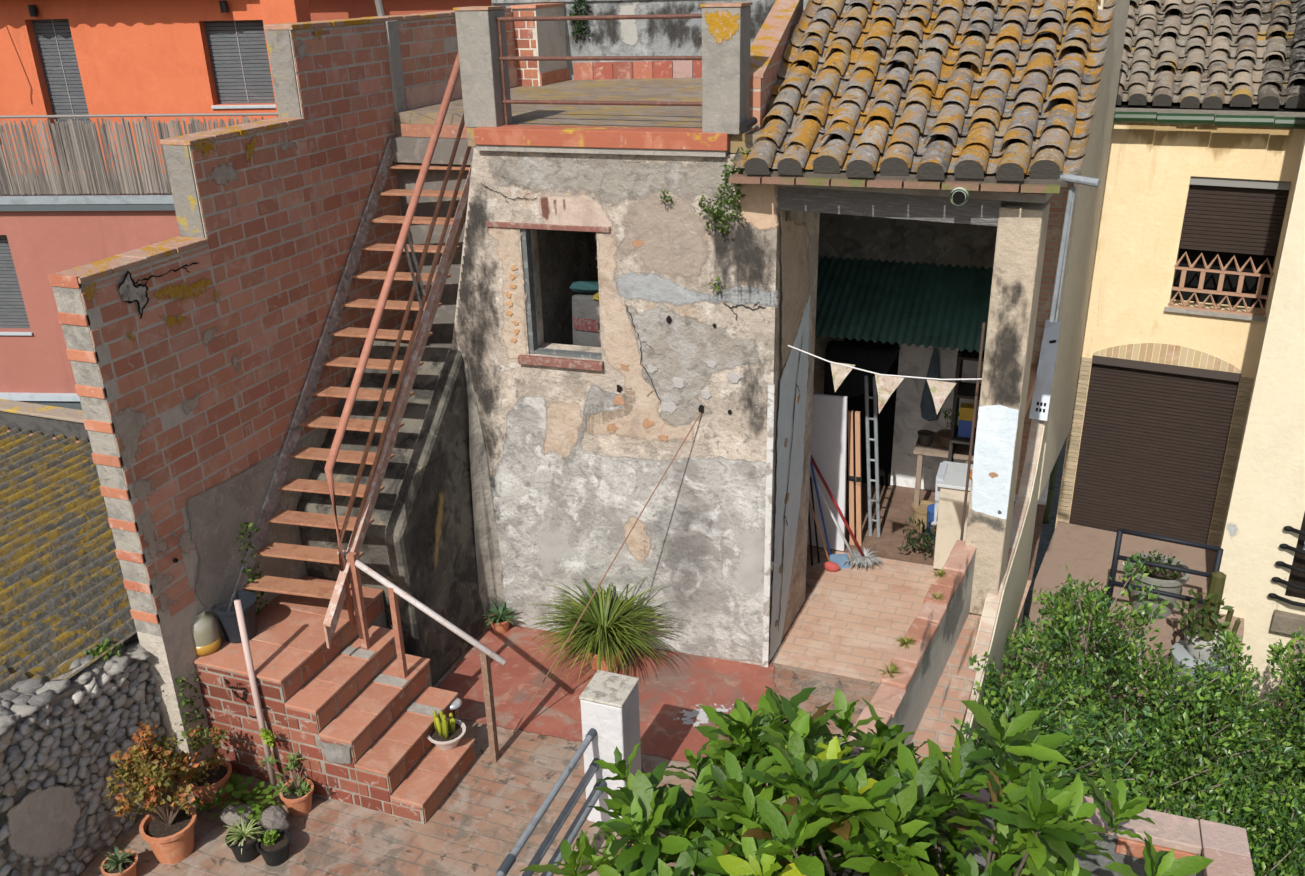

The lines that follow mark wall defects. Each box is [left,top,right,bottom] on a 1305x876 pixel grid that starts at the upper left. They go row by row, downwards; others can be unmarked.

water stain [570,0,703,46]
water stain [751,2,775,39]
crack [119,262,199,319]
spalling [487,154,778,458]
water stain [458,197,498,490]
water stain [744,369,764,430]